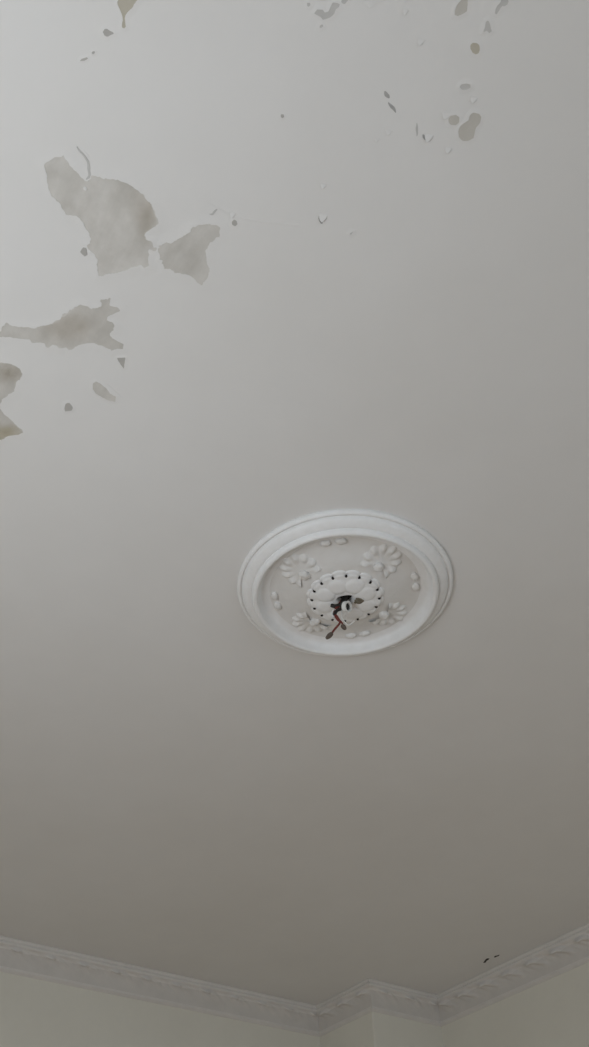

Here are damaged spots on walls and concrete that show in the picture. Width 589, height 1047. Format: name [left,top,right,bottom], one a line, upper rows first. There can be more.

peeling [98,0,144,42]
peeling [444,107,486,145]
peeling [0,145,230,447]